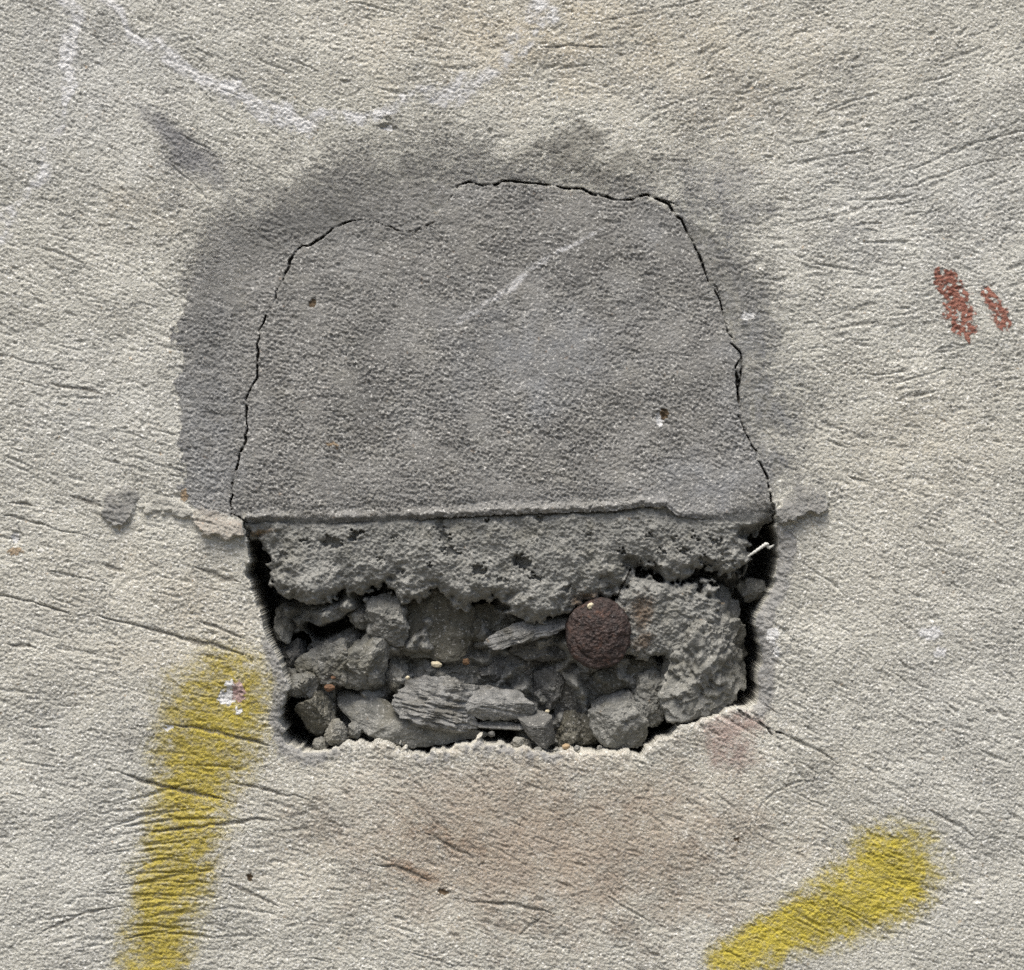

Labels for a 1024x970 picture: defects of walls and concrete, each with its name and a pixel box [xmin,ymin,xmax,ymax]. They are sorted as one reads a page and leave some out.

crack [230,220,434,540]
crack [451,180,775,519]
spalling [244,503,782,749]